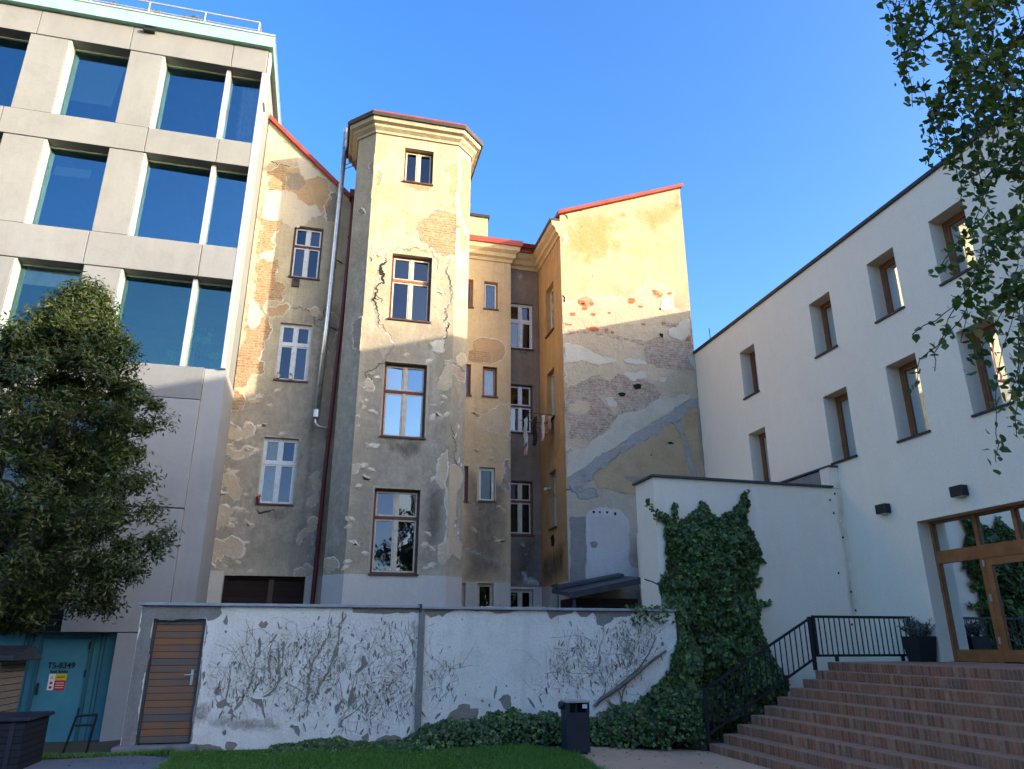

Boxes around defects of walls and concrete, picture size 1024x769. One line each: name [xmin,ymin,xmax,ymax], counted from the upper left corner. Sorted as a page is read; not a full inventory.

flaking render [371,154,471,258]
flaking render [211,156,338,574]
flaking render [307,306,363,354]
flaking render [354,372,381,428]
crack [364,233,465,390]
flaking render [562,278,705,494]
flaking render [323,516,370,574]
flaking render [351,462,376,489]
flaking render [420,449,463,571]